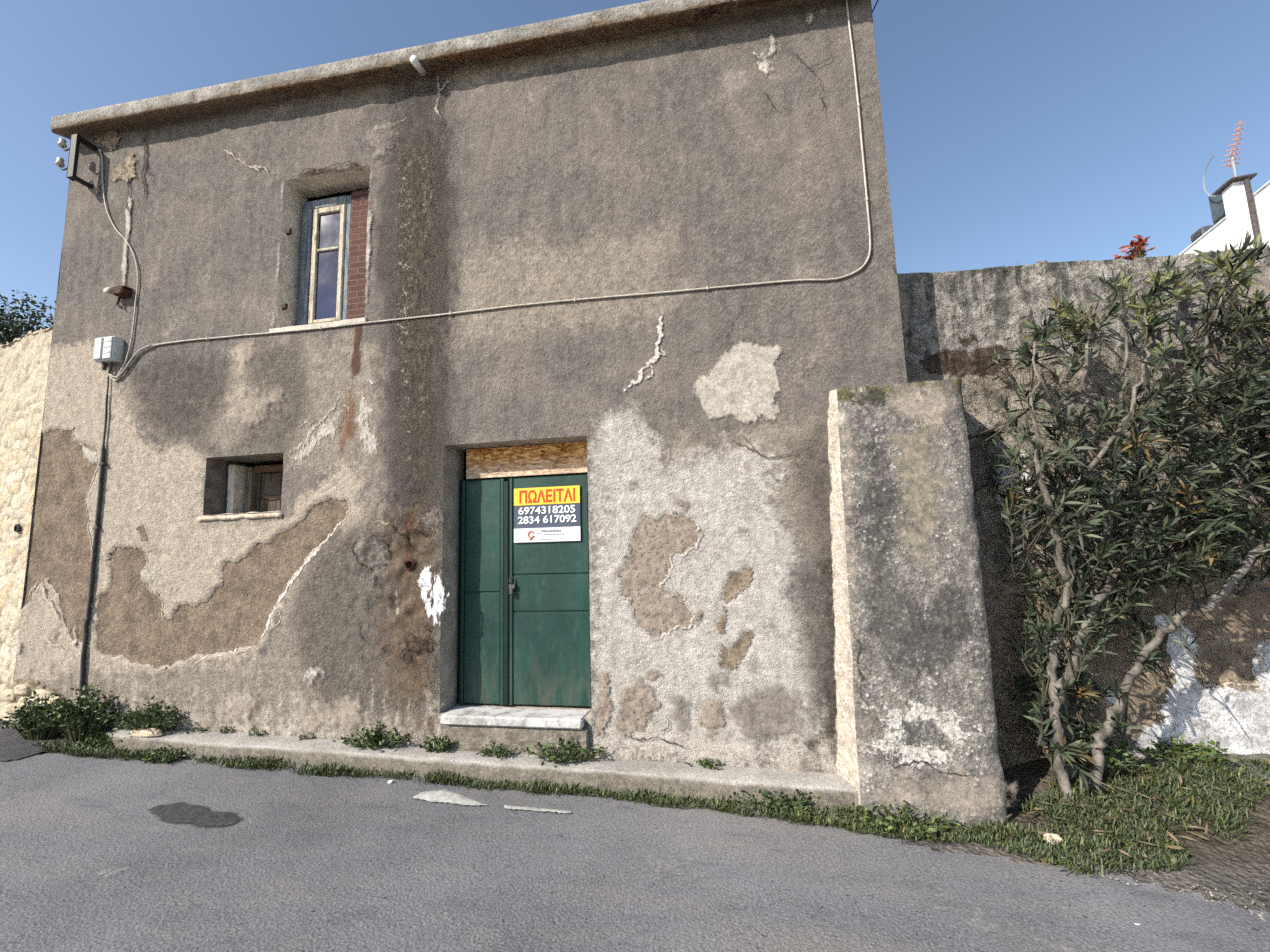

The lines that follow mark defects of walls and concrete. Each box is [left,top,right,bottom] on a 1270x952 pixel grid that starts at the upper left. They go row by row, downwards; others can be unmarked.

flaking render [92,130,138,197]
crack [225,150,268,175]
corrosion [351,324,362,375]
water stain [380,87,448,715]
crack [623,315,666,391]
peeling [993,451,1034,525]
flaking render [19,427,350,669]
water stain [299,697,359,733]
peeling [396,565,449,675]
flaking render [615,497,703,640]
flaking render [716,566,755,671]
peeling [1074,580,1270,757]